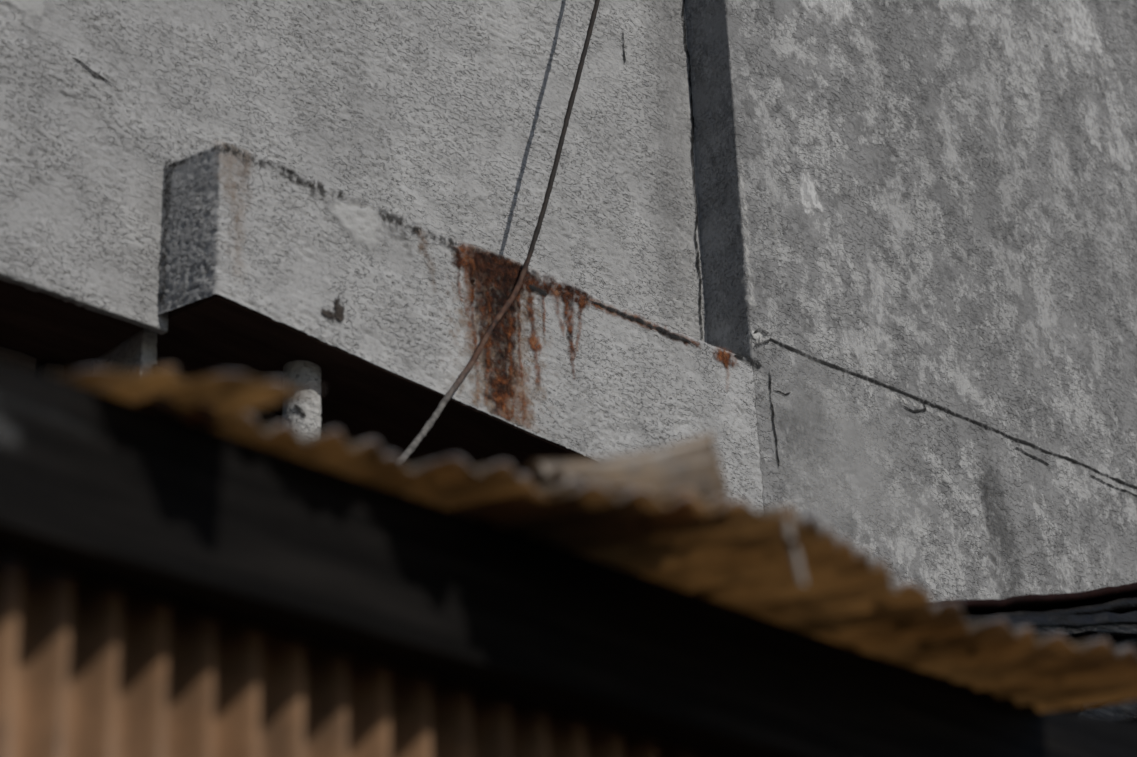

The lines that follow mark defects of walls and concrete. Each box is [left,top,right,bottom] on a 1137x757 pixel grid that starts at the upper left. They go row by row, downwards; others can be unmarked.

crack [591,0,703,346]
crack [529,285,547,296]
corrosion [454,244,699,426]
corrosion [714,350,735,368]
crack [734,338,1137,496]